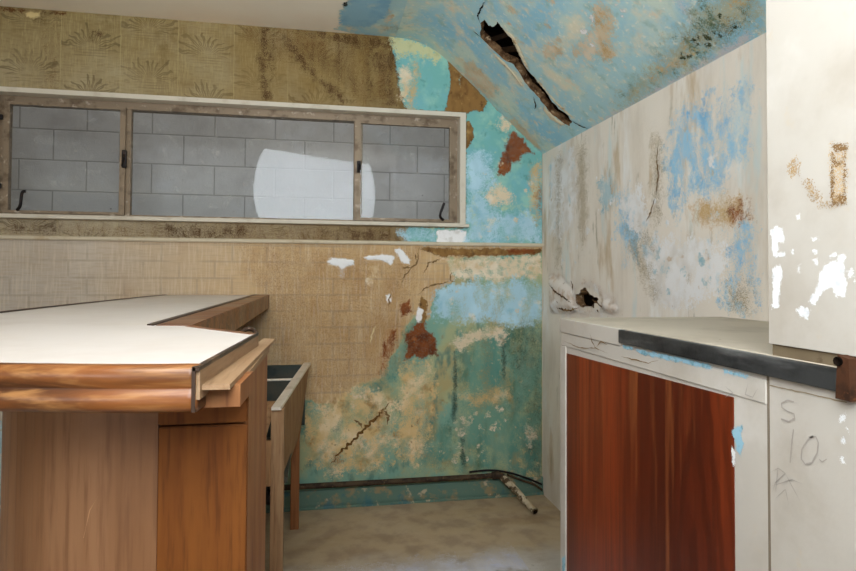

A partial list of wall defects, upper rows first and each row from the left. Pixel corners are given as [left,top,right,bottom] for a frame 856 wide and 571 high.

crack [476,5,588,129]
water stain [610,0,766,111]
peeling [284,0,602,492]
corrosion [685,188,753,235]
corrosion [786,141,850,210]
peeling [796,237,856,320]
crack [331,402,392,463]